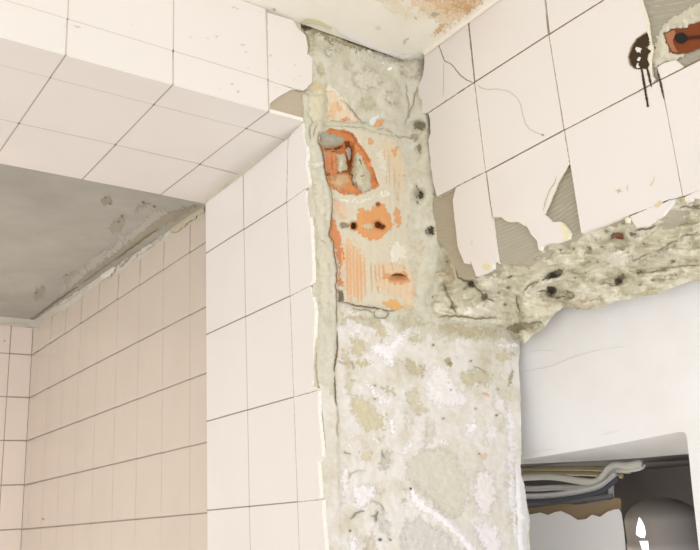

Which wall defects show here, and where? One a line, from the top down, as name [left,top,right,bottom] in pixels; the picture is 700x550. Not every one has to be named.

peeling [300,19,422,65]
crack [438,45,541,135]
spalling [320,114,700,345]
crack [309,122,389,454]
peeling [341,333,388,441]
peeling [374,385,429,416]
peeling [399,358,427,378]
peeling [459,360,499,391]
peeling [363,532,392,550]